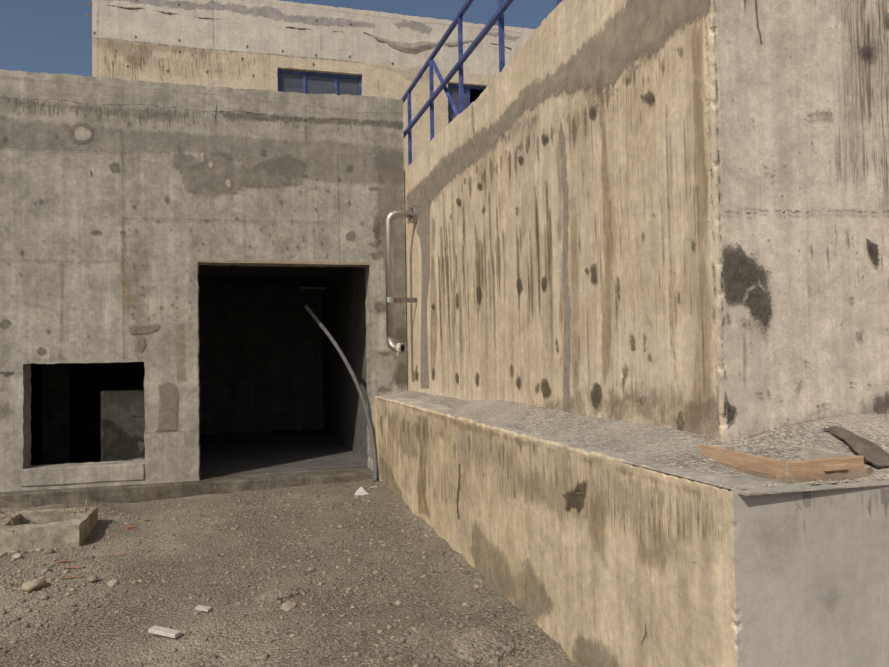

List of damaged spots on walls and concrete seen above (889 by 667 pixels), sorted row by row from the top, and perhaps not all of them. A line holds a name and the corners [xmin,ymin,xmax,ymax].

water stain [127,0,371,27]
water stain [849,0,886,48]
water stain [379,0,715,412]